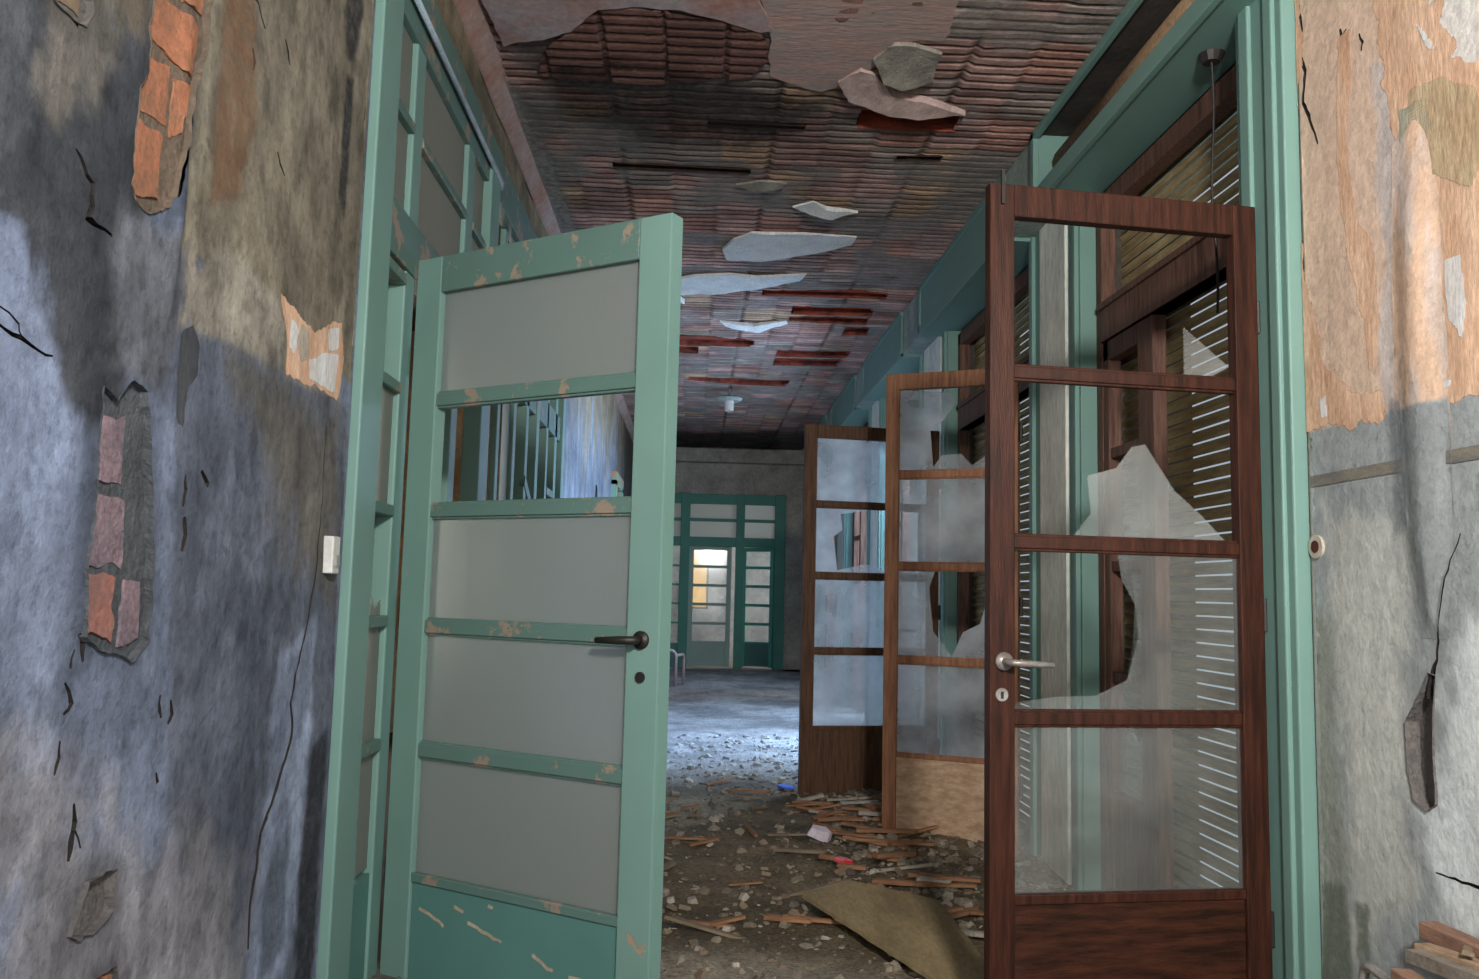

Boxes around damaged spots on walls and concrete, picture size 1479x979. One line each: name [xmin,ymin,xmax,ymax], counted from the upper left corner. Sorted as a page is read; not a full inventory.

spalling [131,0,214,214]
spalling [537,7,769,85]
peeling [838,42,965,132]
crack [0,306,53,357]
peeling [281,293,344,400]
peeling [679,201,887,386]
peeling [1301,242,1386,432]
peeling [1373,0,1479,403]
spalling [78,380,156,662]
crack [247,426,327,950]
crack [1427,533,1461,700]
crack [1436,872,1479,889]